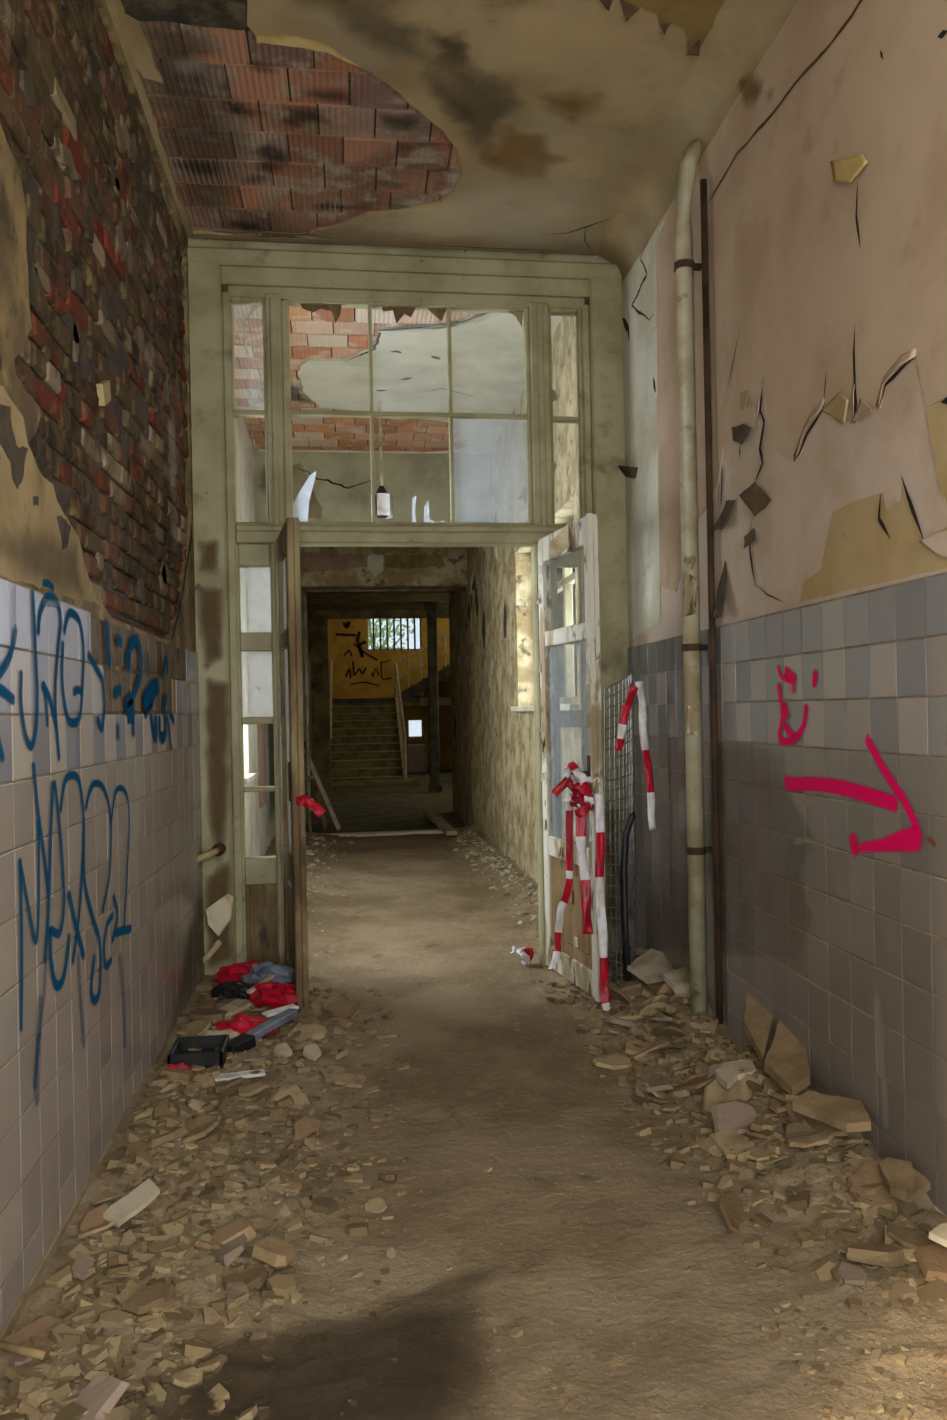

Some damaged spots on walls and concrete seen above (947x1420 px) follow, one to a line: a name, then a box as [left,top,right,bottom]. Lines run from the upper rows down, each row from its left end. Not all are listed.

spalling [0,0,462,712]
spalling [289,306,502,519]
peeling [600,0,947,641]
peeling [201,589,228,844]
spalling [256,673,275,809]